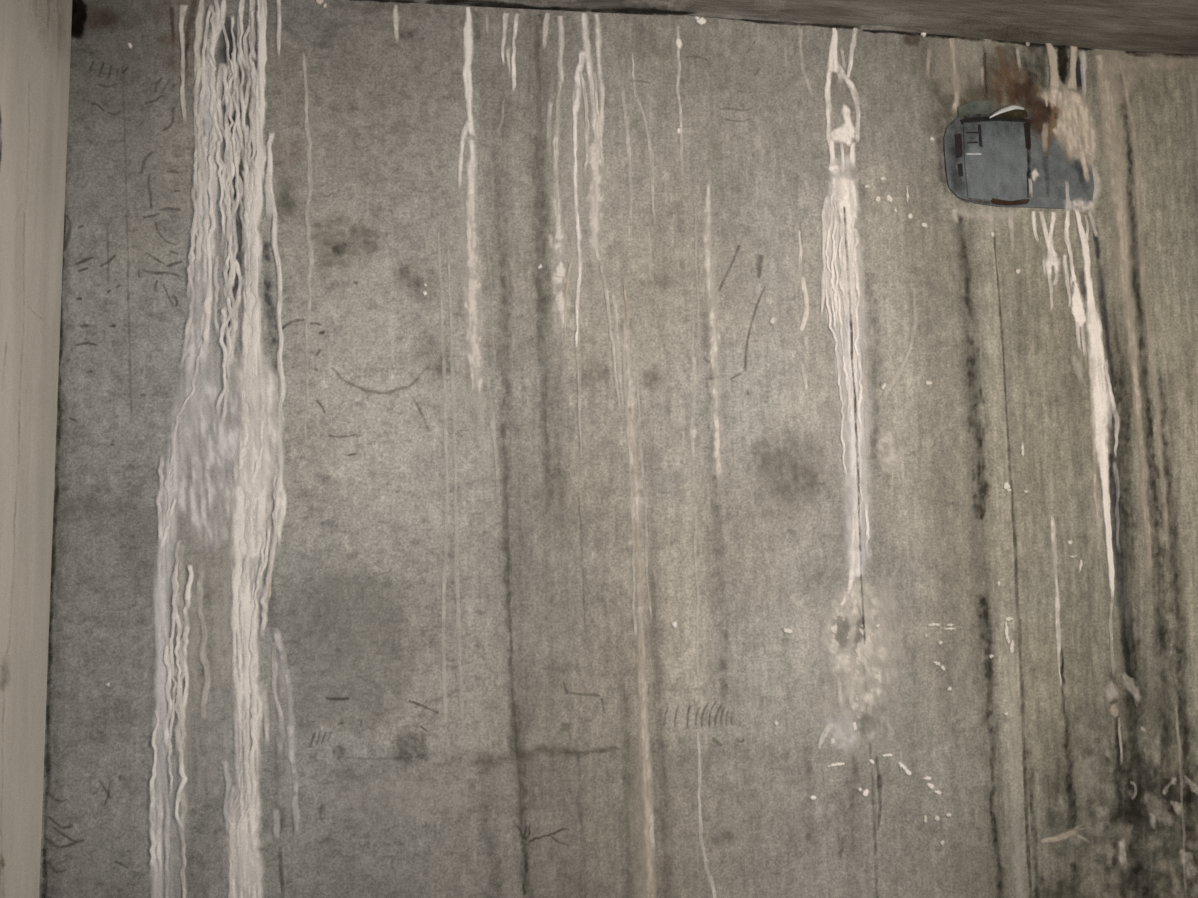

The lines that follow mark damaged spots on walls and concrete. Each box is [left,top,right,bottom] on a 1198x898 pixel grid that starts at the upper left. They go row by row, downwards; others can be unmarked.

water stain [150,0,299,898]
efflorescence [440,7,490,393]
efflorescence [501,13,518,90]
water stain [543,13,656,898]
efflorescence [798,25,896,748]
water stain [1032,43,1192,700]